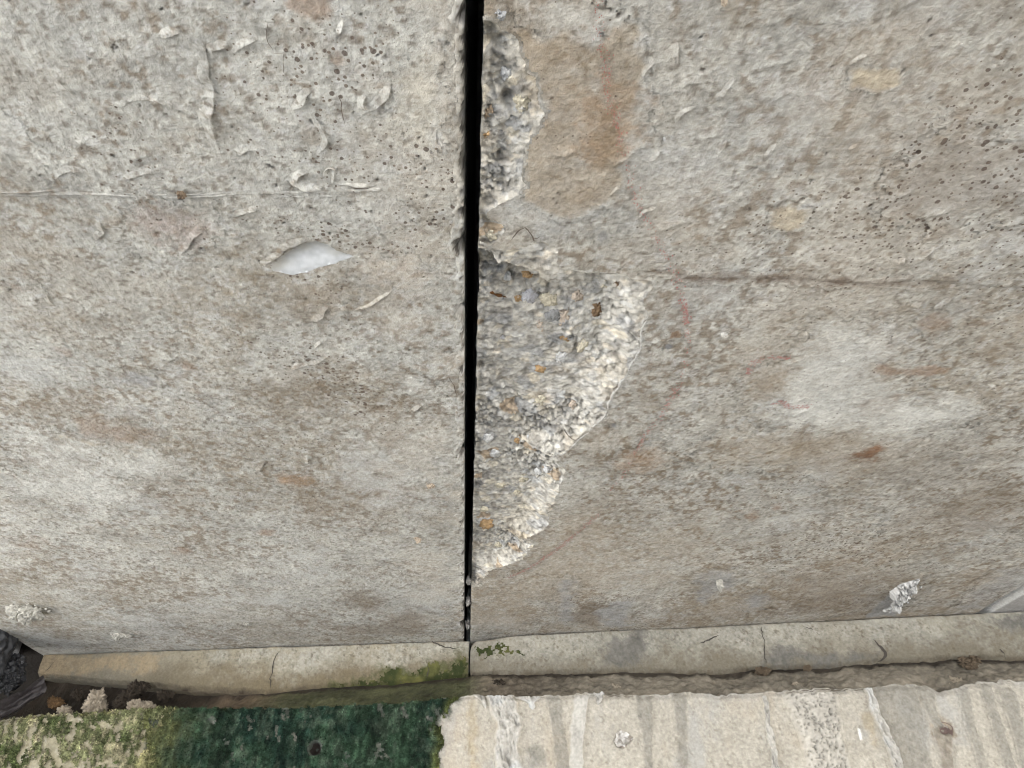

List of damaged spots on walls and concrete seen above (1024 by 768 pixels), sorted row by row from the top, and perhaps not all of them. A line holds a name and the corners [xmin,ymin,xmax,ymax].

peeling [158,26,180,39]
peeling [105,36,258,159]
peeling [291,88,313,110]
peeling [353,83,391,119]
peeling [311,116,328,156]
peeling [235,144,264,157]
peeling [122,168,157,180]
peeling [287,167,375,192]
peeling [231,207,259,217]
peeling [260,237,353,275]
spalling [446,0,653,641]